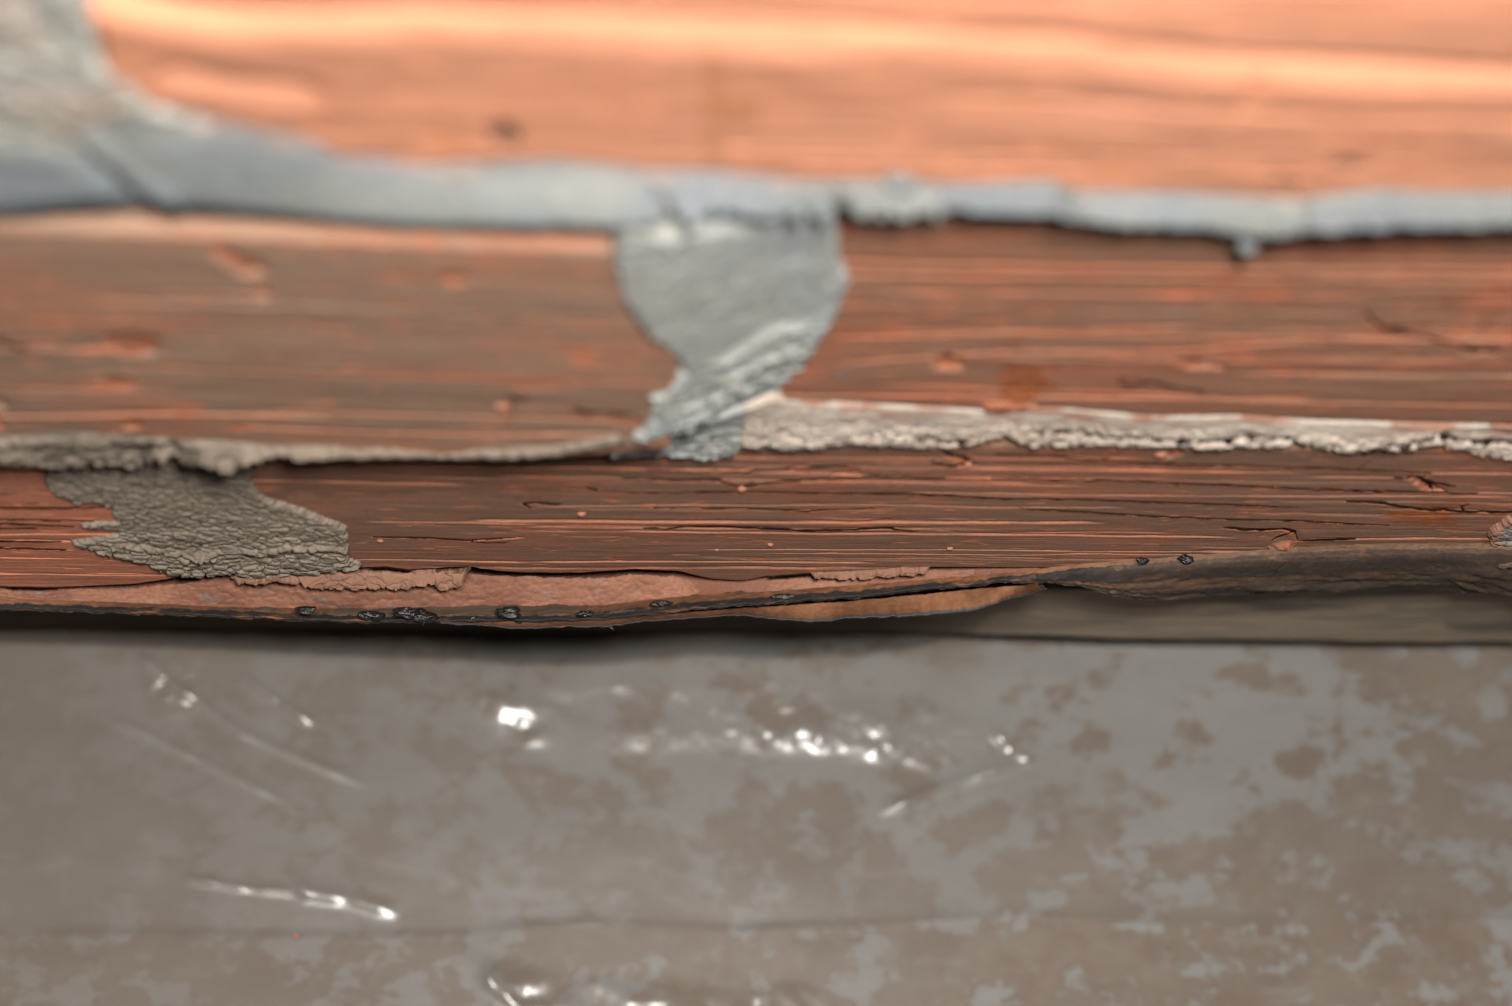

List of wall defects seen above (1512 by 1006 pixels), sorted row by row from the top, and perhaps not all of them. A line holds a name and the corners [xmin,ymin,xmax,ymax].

spalling [486,122,526,147]